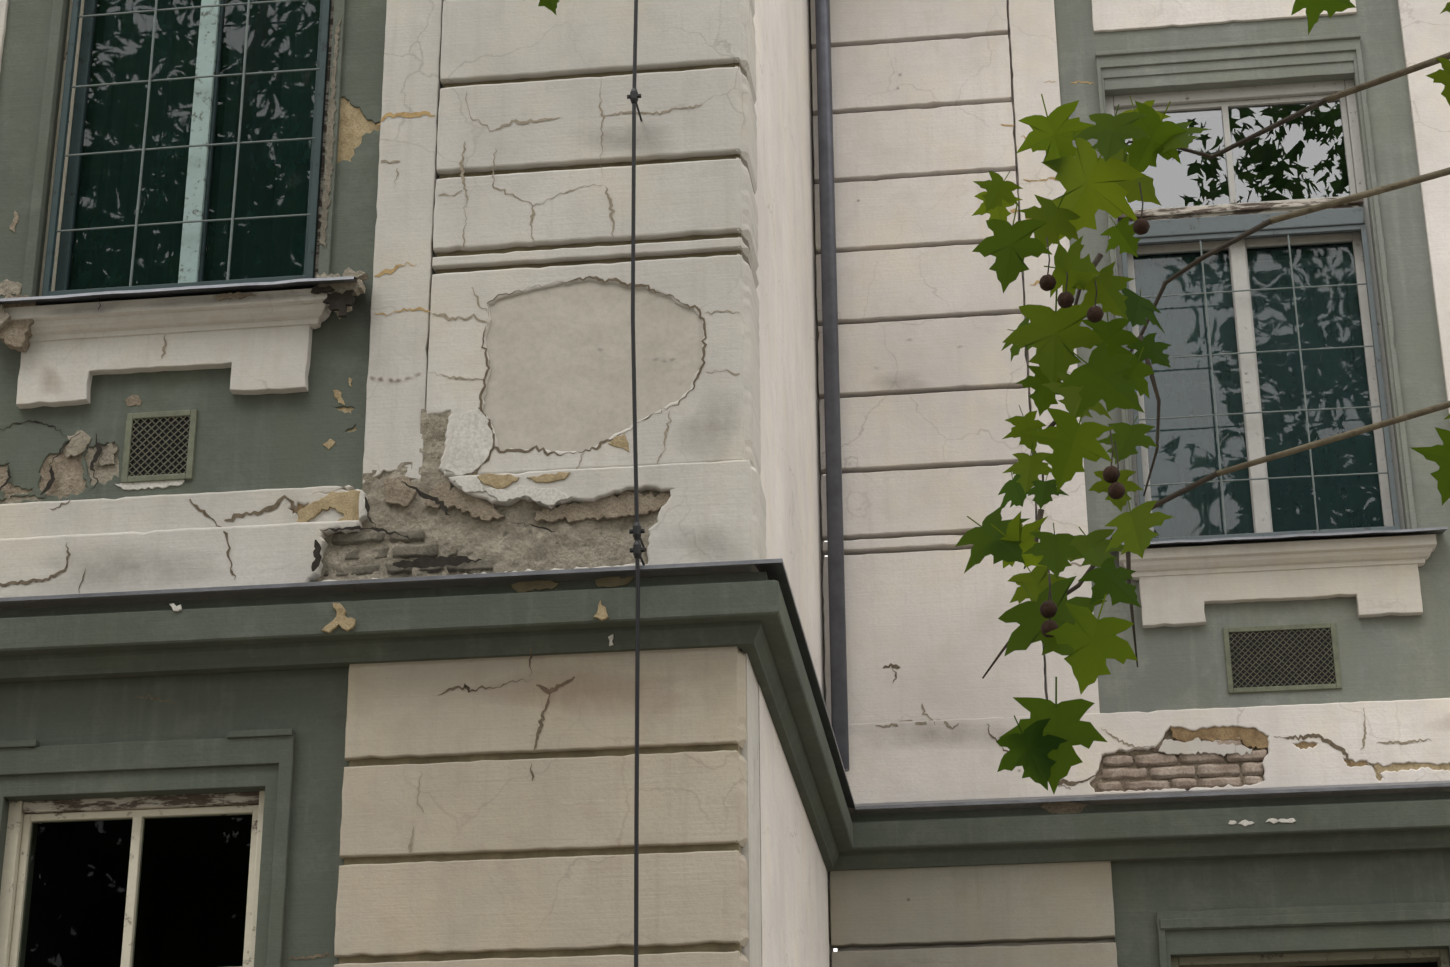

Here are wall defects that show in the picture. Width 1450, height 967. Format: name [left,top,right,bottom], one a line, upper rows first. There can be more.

crack [377,78,702,249]
crack [374,261,415,277]
spalling [0,279,39,352]
crack [374,276,740,482]
peeling [0,430,185,504]
crack [0,543,86,593]
crack [189,495,298,579]
spalling [290,409,671,621]
peeling [321,603,356,633]
crack [439,648,575,781]
flaking render [1040,726,1269,814]
crack [1274,709,1432,777]